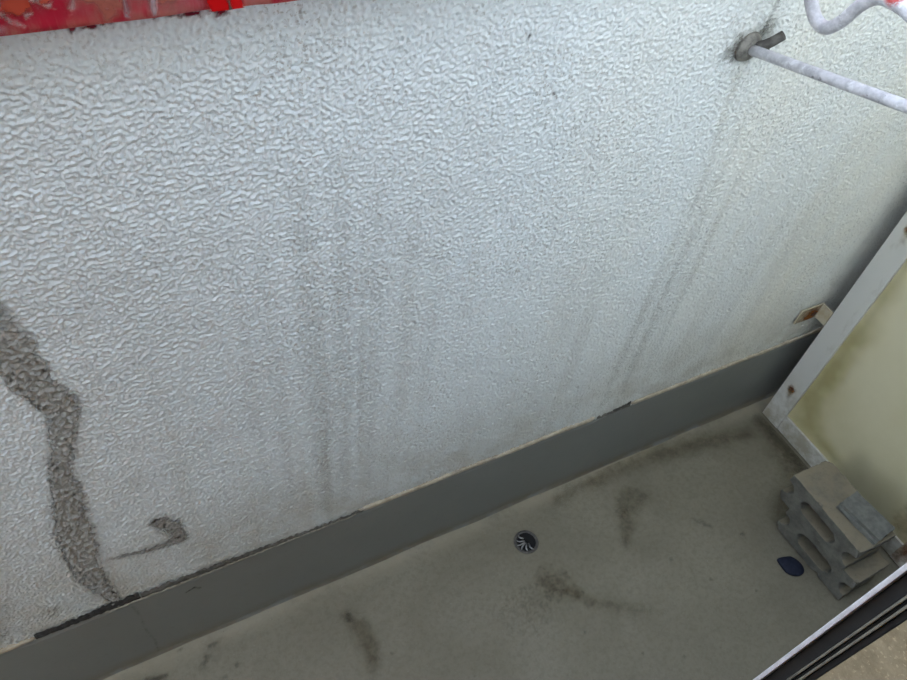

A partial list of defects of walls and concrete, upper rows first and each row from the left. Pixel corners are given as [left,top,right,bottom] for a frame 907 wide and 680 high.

crack [0,309,119,607]